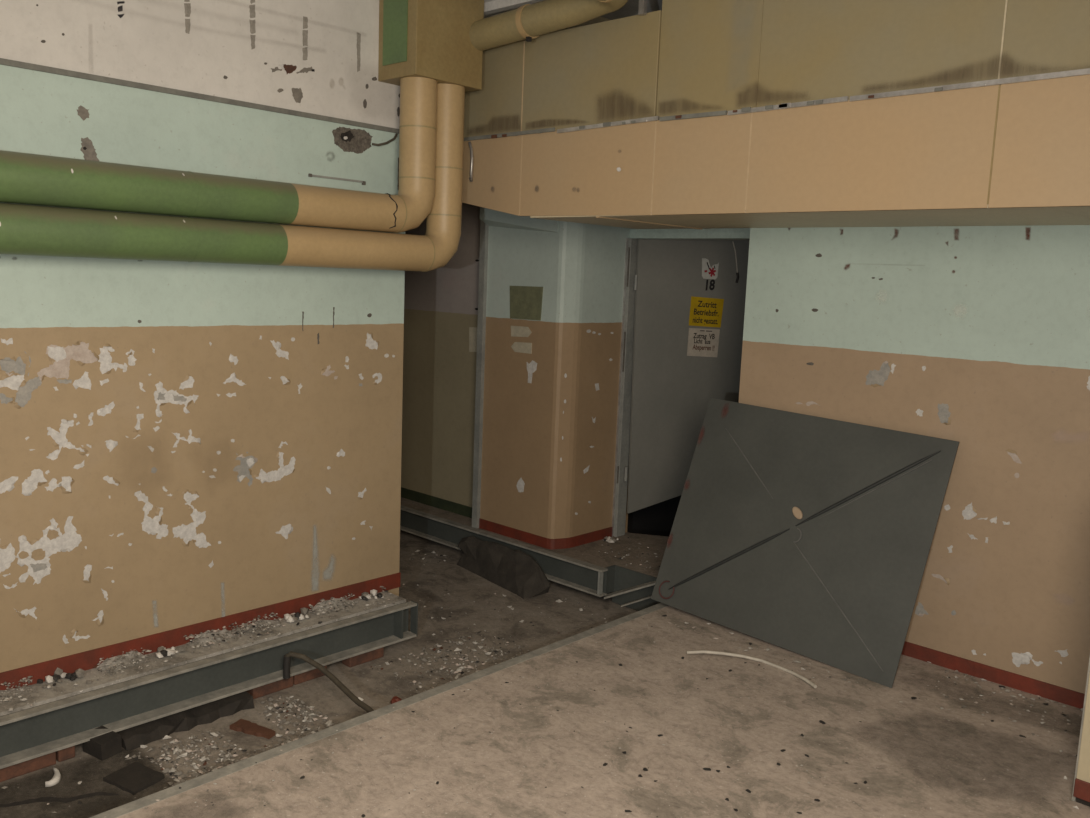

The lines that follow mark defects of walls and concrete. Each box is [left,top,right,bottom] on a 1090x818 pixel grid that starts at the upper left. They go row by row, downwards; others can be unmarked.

spalling [332,127,373,154]
peeling [0,338,137,409]
peeling [217,354,247,397]
peeling [259,336,295,360]
peeling [105,374,201,453]
peeling [0,402,115,496]
peeling [231,439,296,486]
peeling [134,483,221,548]
peeling [944,503,1010,525]
peeling [0,516,87,589]
peeling [82,565,114,626]
peeling [1012,652,1043,667]